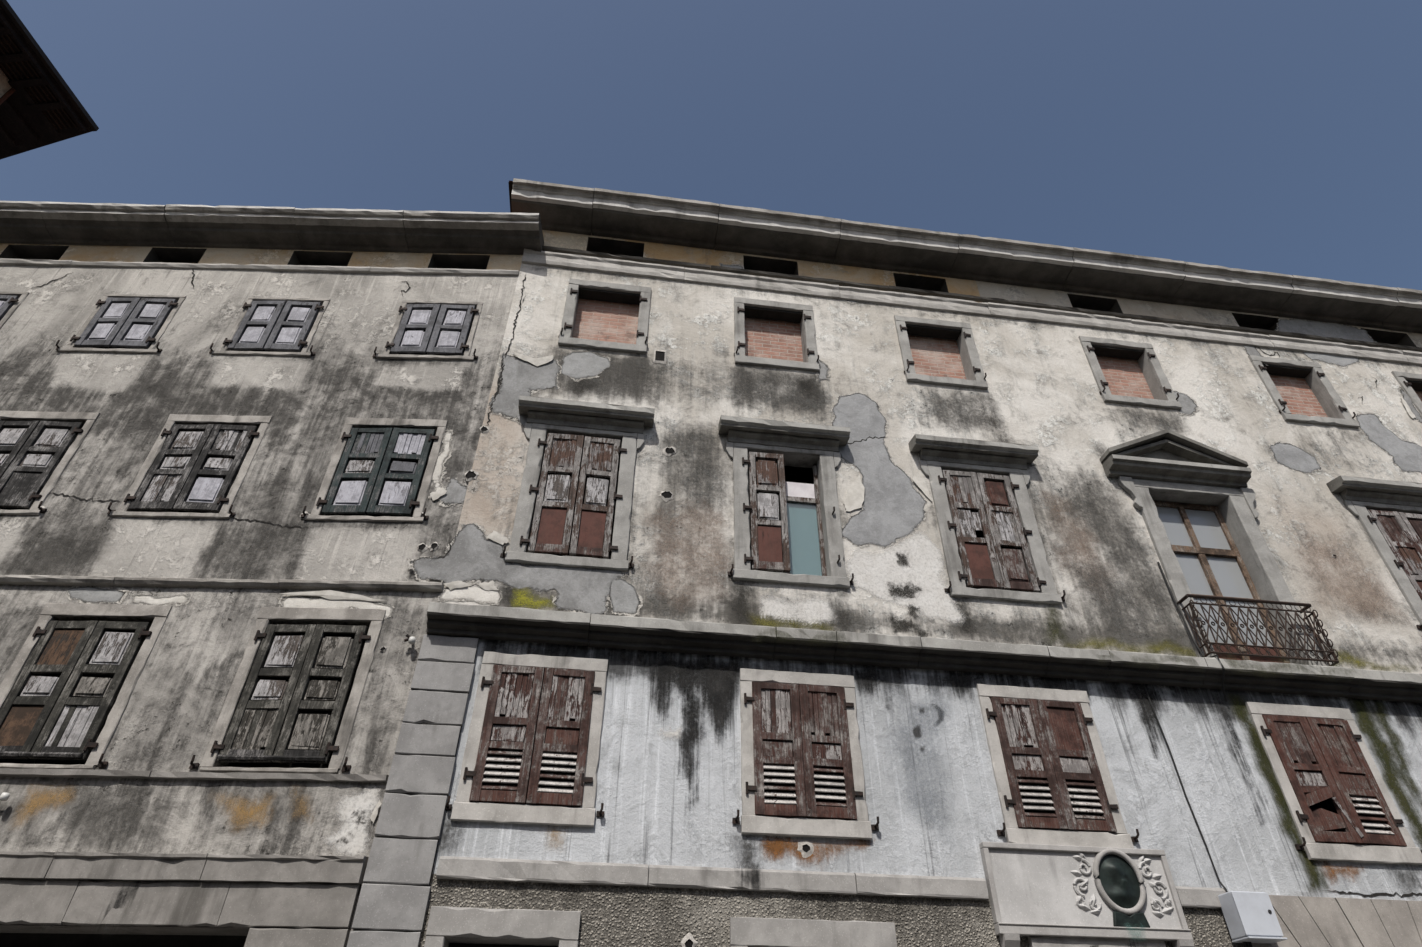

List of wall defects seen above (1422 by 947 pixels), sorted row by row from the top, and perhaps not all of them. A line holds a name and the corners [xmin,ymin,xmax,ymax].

crack [484,275,526,429]
damp [737,372,824,405]
peeling [843,474,865,512]
peeling [912,473,932,501]
damp [4,531,103,575]
spalling [417,542,439,553]
peeling [486,530,509,545]
damp [1047,484,1178,625]
flaking render [435,580,503,605]
damp [526,644,740,782]
damp [1373,700,1422,805]
flaking render [326,786,382,856]